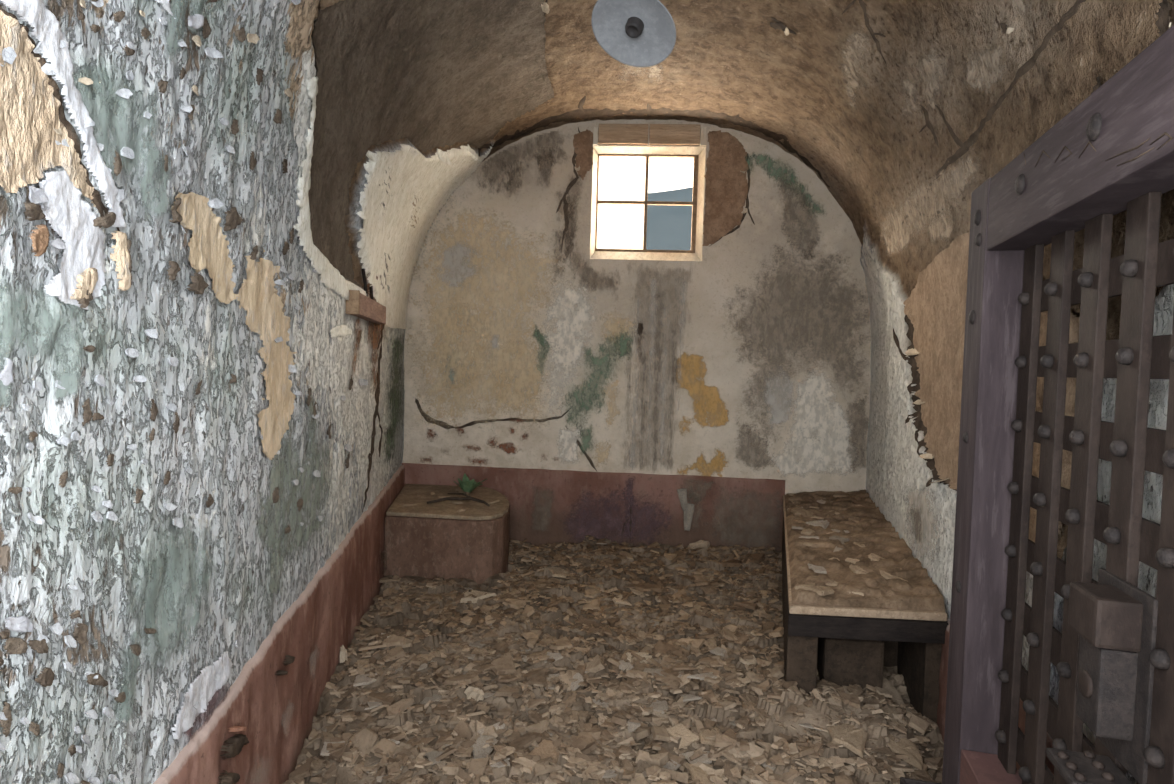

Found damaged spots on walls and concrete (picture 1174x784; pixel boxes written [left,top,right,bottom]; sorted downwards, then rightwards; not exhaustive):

peeling [123,0,224,58]
flaking render [0,0,135,309]
flaking render [167,0,554,464]
flaking render [702,130,749,246]
crack [884,0,1086,245]
damp [736,179,868,469]
peeling [56,374,114,446]
crack [415,398,597,471]
damp [559,424,611,463]
damp [675,352,729,434]
damp [678,450,782,547]
crack [893,306,957,491]